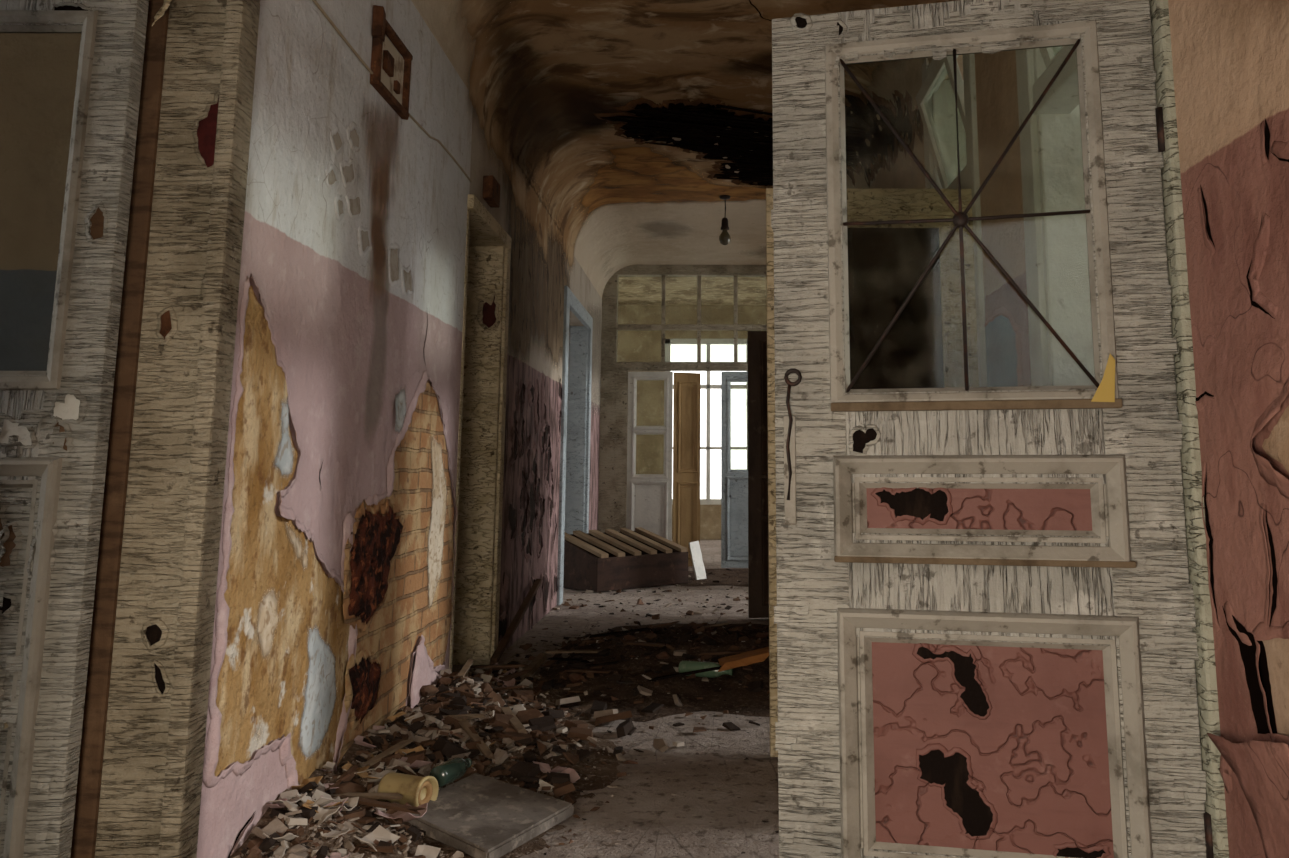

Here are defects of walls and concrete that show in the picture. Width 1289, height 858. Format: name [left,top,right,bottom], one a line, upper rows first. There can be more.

crack [1260,119,1289,165]
crack [1197,185,1216,255]
crack [1246,213,1278,319]
crack [1195,391,1214,411]
flaking render [1249,377,1289,499]
flaking render [202,273,458,789]
crack [1202,462,1278,650]
peeling [1232,615,1289,747]
crack [1219,755,1233,793]